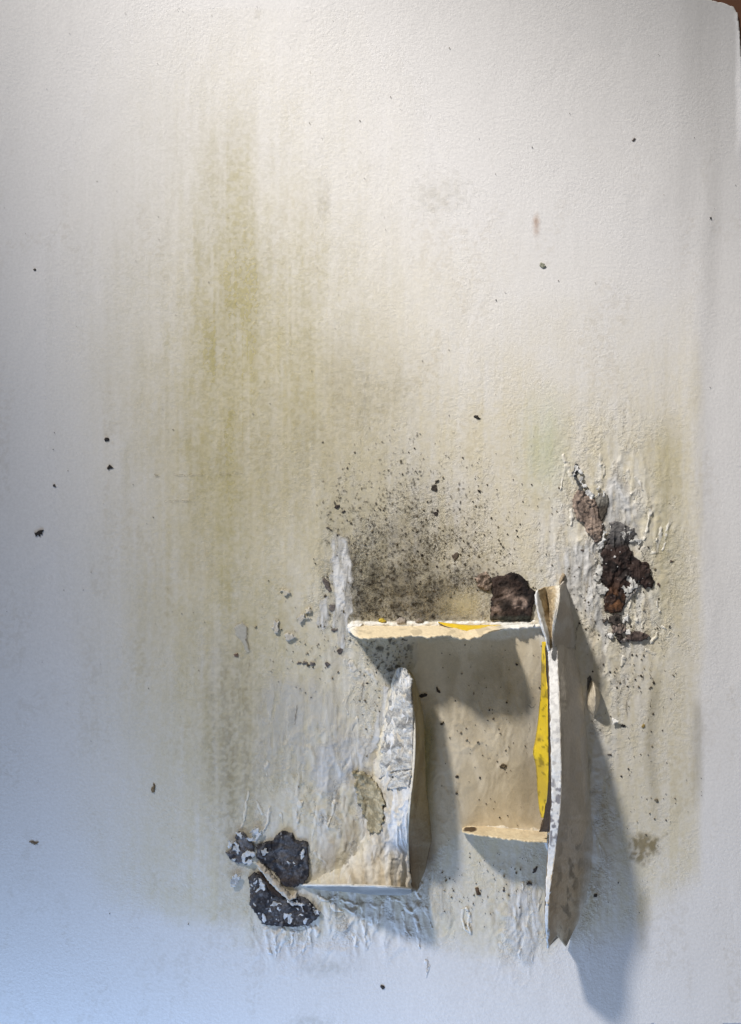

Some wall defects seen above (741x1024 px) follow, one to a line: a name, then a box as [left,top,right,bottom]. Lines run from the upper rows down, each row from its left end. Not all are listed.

peeling [225,667,432,927]
damp [349,638,409,679]
damp [323,459,509,622]
peeling [347,571,593,949]